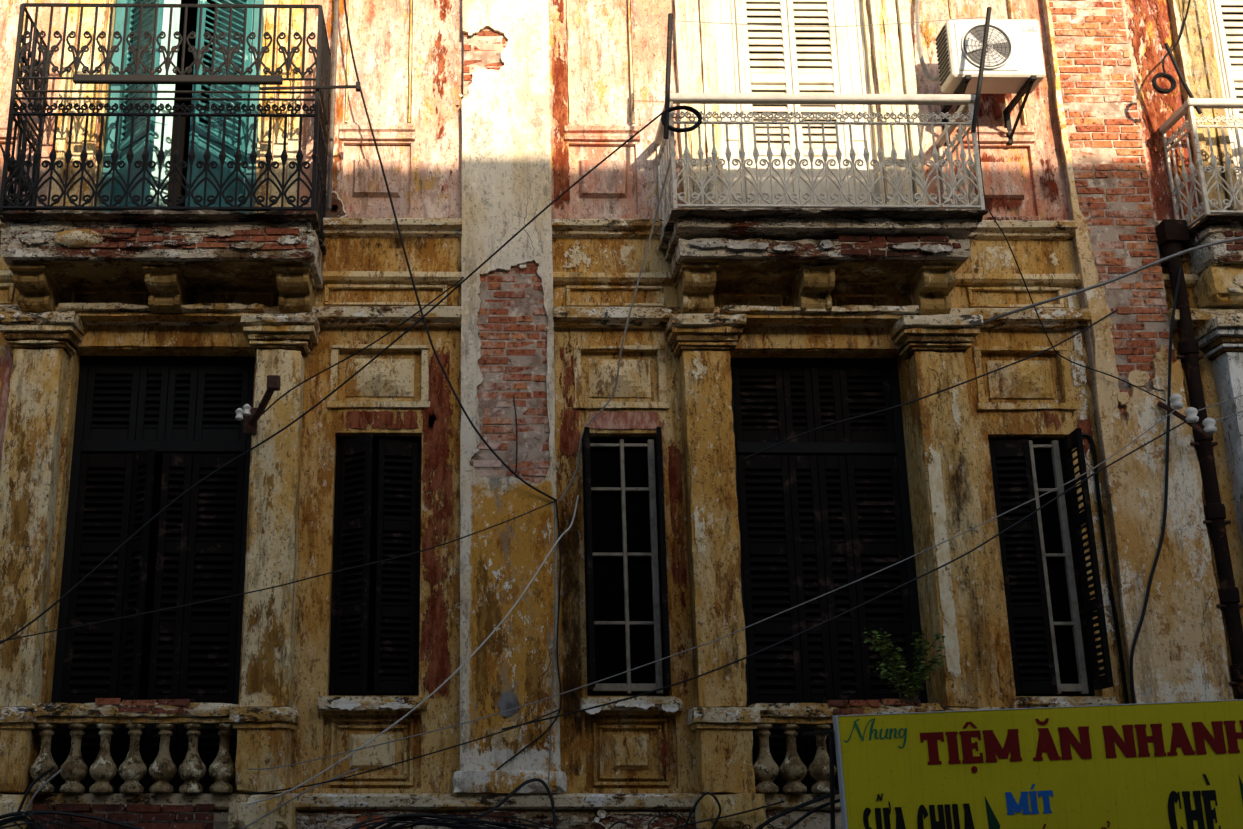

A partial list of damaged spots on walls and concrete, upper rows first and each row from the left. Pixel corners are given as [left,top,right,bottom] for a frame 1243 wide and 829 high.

spalling [433,0,510,150]
spalling [1049,0,1187,414]
peeling [18,231,49,245]
spalling [75,228,307,250]
peeling [688,239,798,252]
spalling [819,236,1014,269]
spalling [1224,230,1243,250]
peeling [1228,273,1243,293]
spalling [337,256,707,714]
spalling [95,698,194,714]
peeling [328,697,361,711]